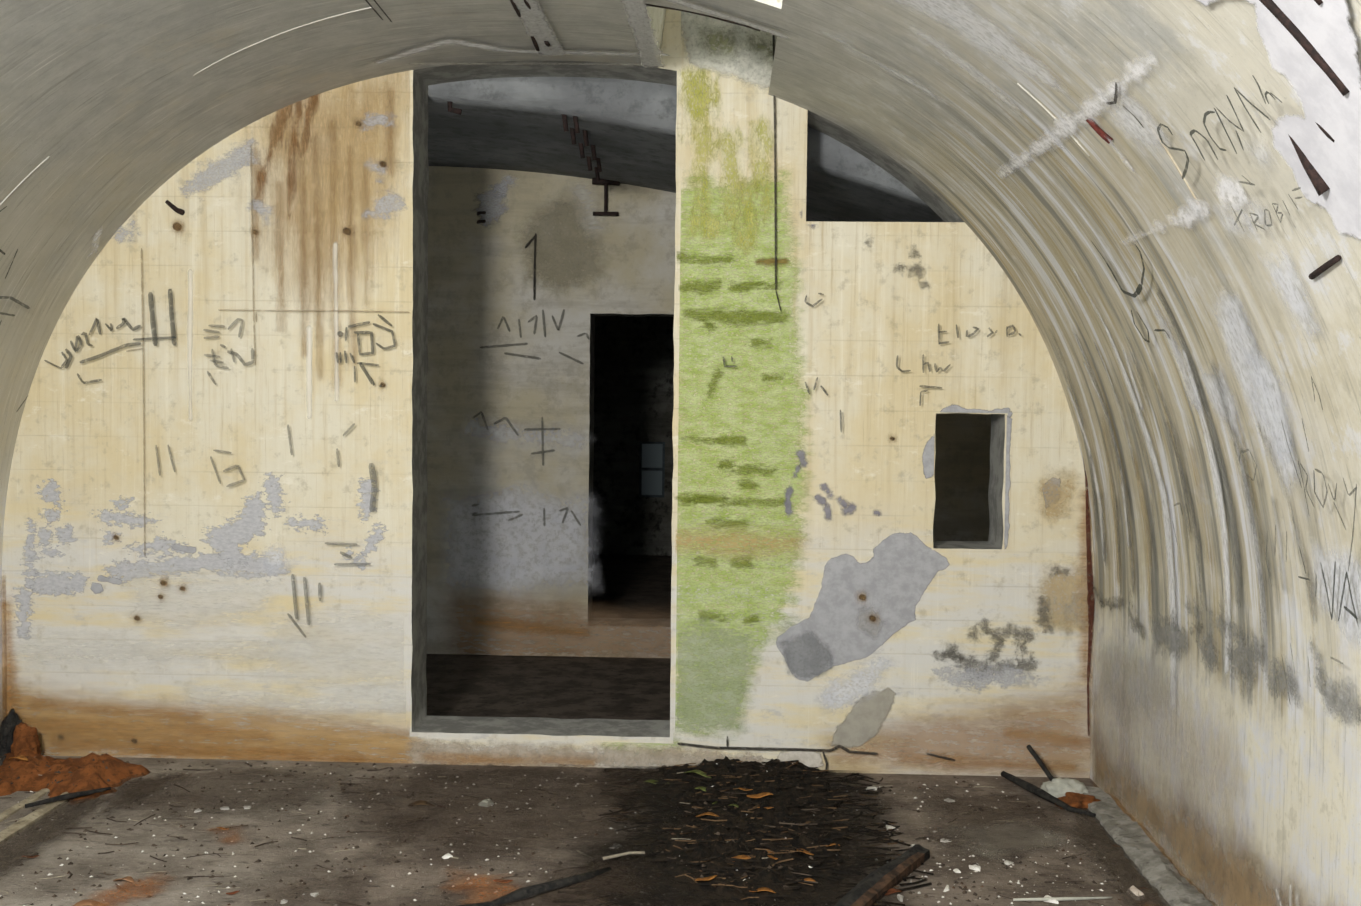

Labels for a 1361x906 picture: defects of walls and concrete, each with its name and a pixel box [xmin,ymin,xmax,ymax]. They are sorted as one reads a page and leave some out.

crack [365,0,392,22]
rust [257,95,318,192]
leakage [676,11,788,265]
spalling [1246,0,1361,240]
leakage [680,280,788,348]
peeling [12,472,327,640]
peeling [776,532,949,681]
leakage [933,289,1298,707]
leakage [1291,508,1361,638]
rust [0,632,414,764]
peeling [746,688,896,767]
rust [450,875,515,903]